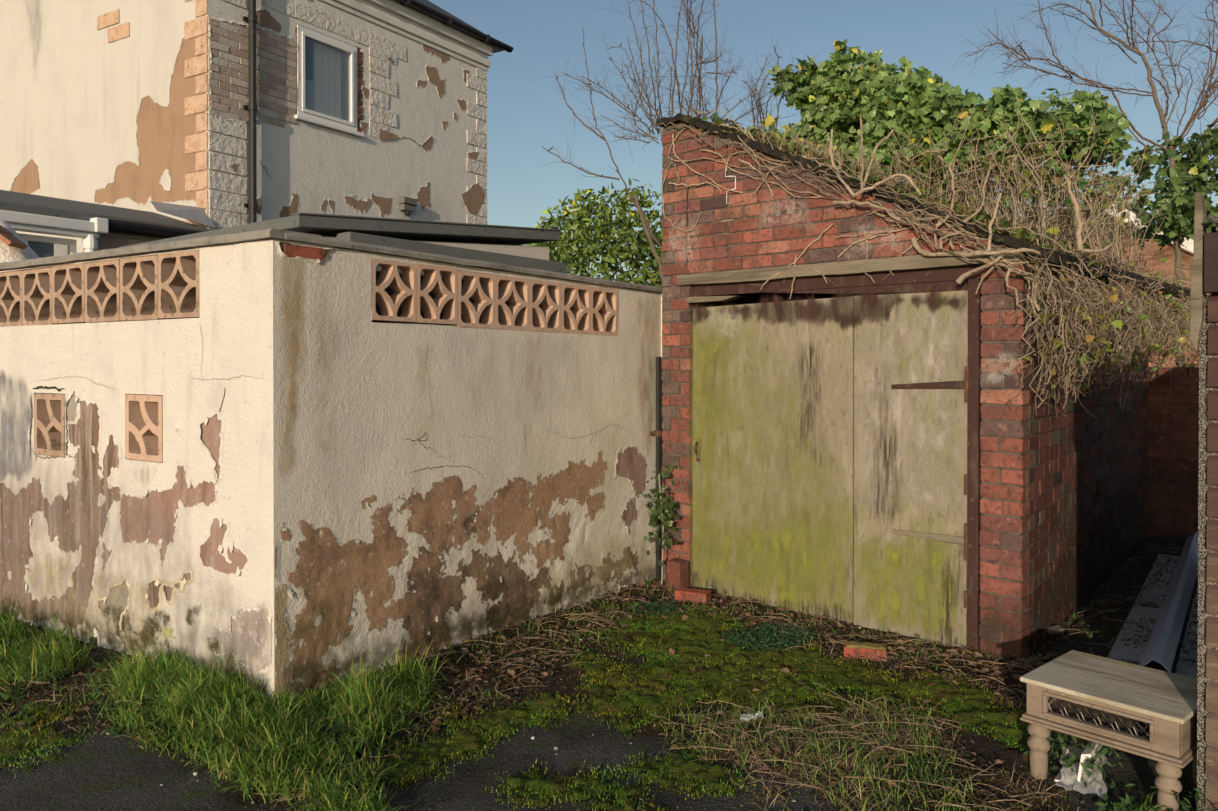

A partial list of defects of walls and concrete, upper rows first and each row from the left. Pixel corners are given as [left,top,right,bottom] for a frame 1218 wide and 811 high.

flaking render [9,156,43,195]
flaking render [93,8,300,208]
peeling [320,192,392,218]
peeling [416,43,470,153]
peeling [460,182,485,216]
crack [725,165,736,204]
water stain [0,409,32,481]
water stain [285,274,301,412]
crack [403,343,498,479]
water stain [864,315,956,510]
peeling [0,388,252,647]
peeling [207,442,647,701]